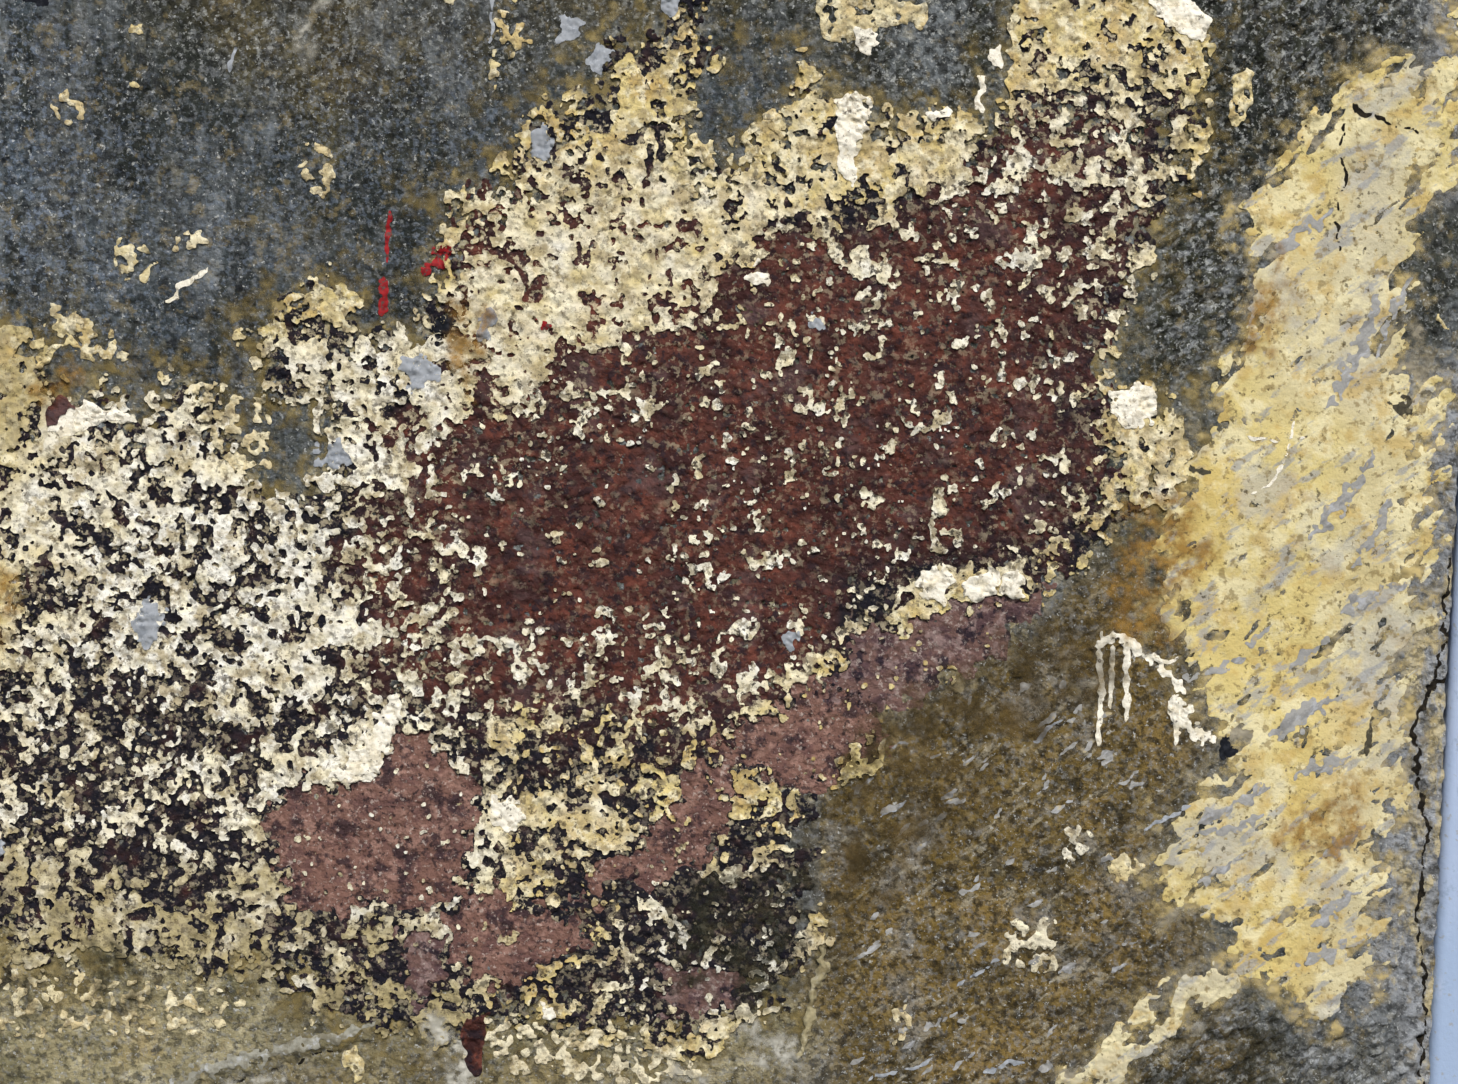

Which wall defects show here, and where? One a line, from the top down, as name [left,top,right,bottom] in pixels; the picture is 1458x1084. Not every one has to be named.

peeling [706,45,726,74]
peeling [853,26,879,56]
peeling [987,44,1004,69]
peeling [974,75,986,113]
peeling [488,151,513,180]
rust [448,301,494,368]
peeling [157,363,174,385]
peeling [837,739,886,786]
crack [1409,558,1452,1084]
spalling [400,930,450,1004]
peeling [540,1001,556,1021]
peeling [1055,961,1241,1084]